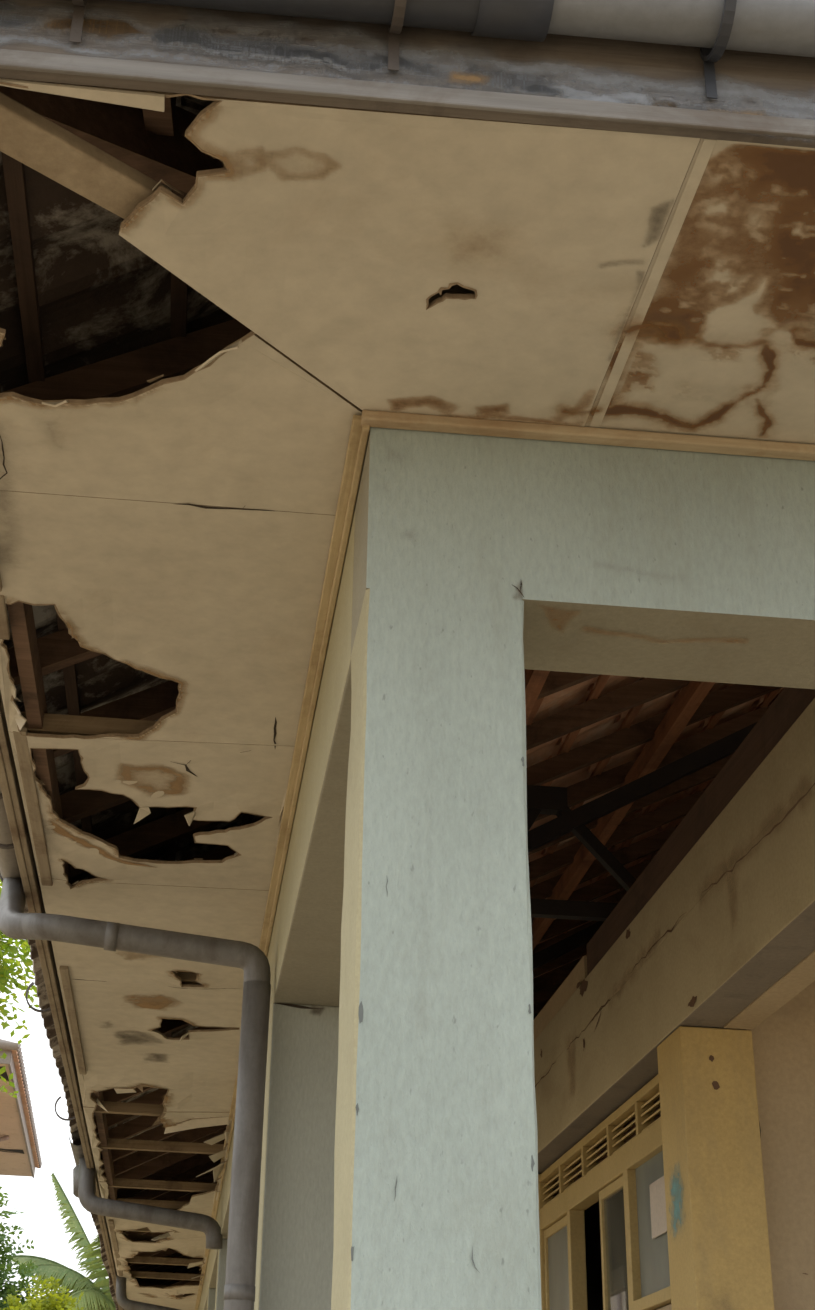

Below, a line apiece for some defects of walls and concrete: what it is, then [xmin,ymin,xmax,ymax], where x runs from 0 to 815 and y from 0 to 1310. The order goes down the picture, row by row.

leakage [479,145,815,436]
peeling [195,340,242,372]
leakage [392,398,459,417]
crack [0,436,8,479]
crack [177,503,270,511]
peeling [10,684,27,730]
leakage [119,765,186,795]
peeling [134,807,151,824]
crack [535,783,815,1087]
peeling [152,1114,229,1182]